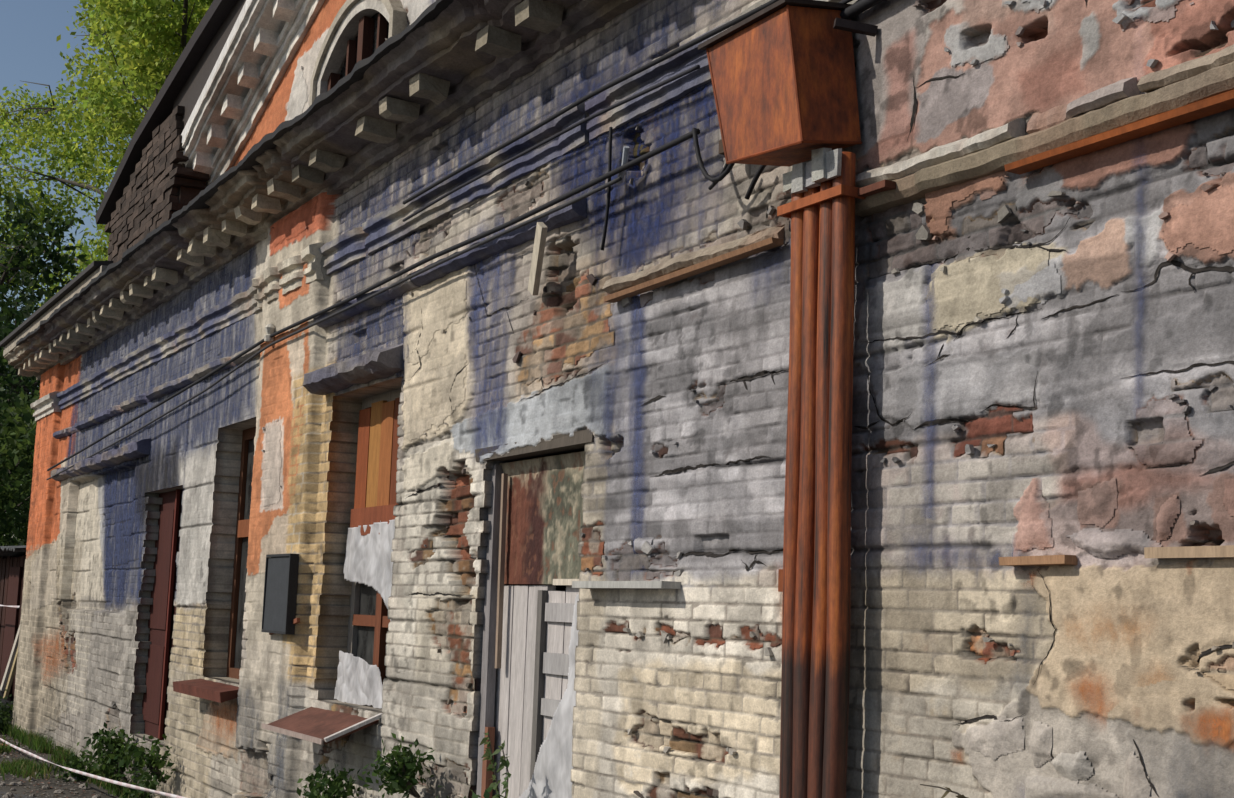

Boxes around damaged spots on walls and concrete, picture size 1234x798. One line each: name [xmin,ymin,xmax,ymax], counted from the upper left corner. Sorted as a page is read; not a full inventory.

peeling [944,26,1026,67]
crack [909,218,1070,269]
spalling [512,244,714,385]
crack [868,260,1234,366]
crack [1120,360,1234,379]
crack [854,372,1038,430]
spalling [1129,373,1234,468]
spalling [410,464,476,717]
spalling [605,622,782,656]
crack [1033,569,1056,685]
spalling [626,712,737,763]
crack [953,713,1025,725]